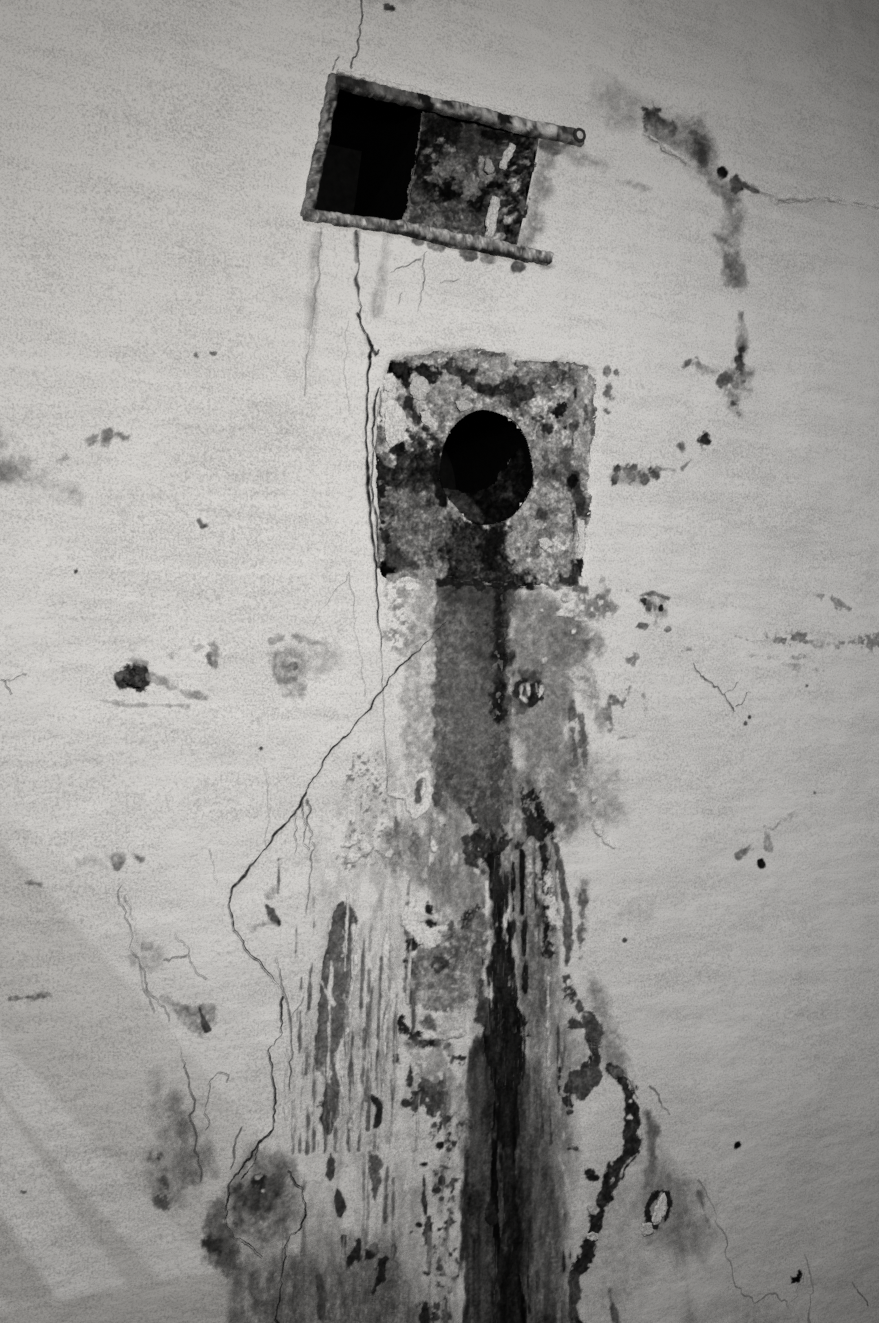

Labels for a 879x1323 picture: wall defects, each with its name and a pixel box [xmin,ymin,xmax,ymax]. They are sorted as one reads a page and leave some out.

crack [333,0,364,70]
damp [519,139,595,247]
damp [627,107,760,288]
damp [603,365,619,414]
damp [683,313,753,416]
damp [611,431,712,485]
crack [118,230,456,1323]
damp [382,574,647,1323]
peeling [256,752,492,1323]
damp [644,1111,702,1247]
damp [316,1273,325,1320]